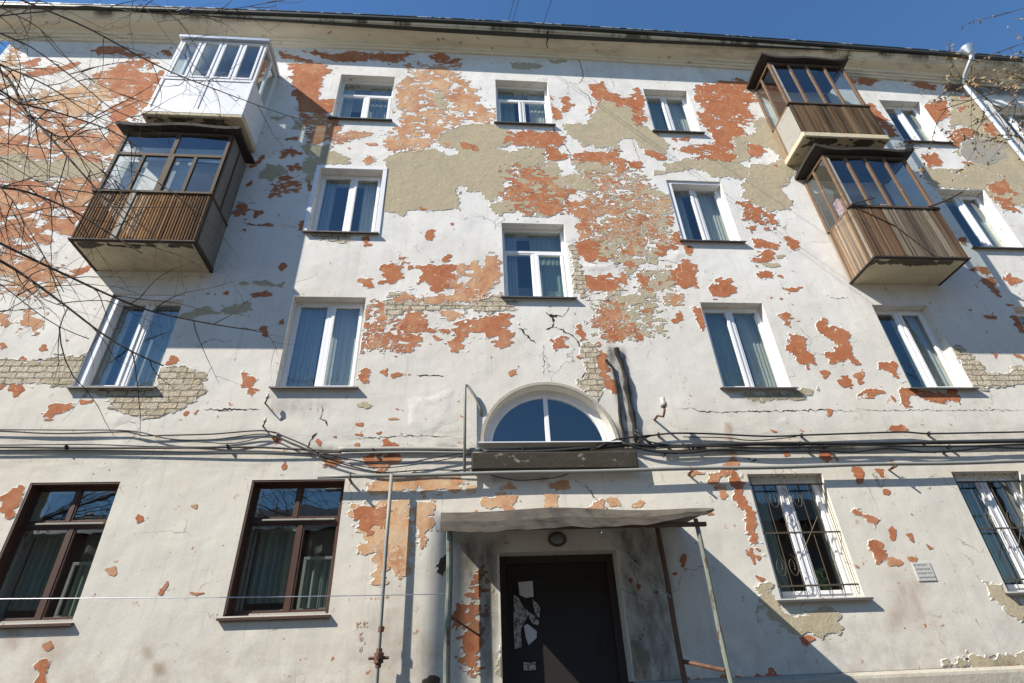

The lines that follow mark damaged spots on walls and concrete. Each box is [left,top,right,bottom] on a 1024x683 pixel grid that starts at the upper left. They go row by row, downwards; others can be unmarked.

flaking render [910,82,1024,213]
peeling [0,46,208,423]
flaking render [231,49,963,411]
crack [518,299,618,373]
flaking render [951,344,1024,392]
peeling [315,436,346,469]
peeling [344,423,518,587]
peeling [543,479,572,508]
flaking render [684,454,844,646]
peeling [434,554,501,678]
flaking render [940,650,1024,668]